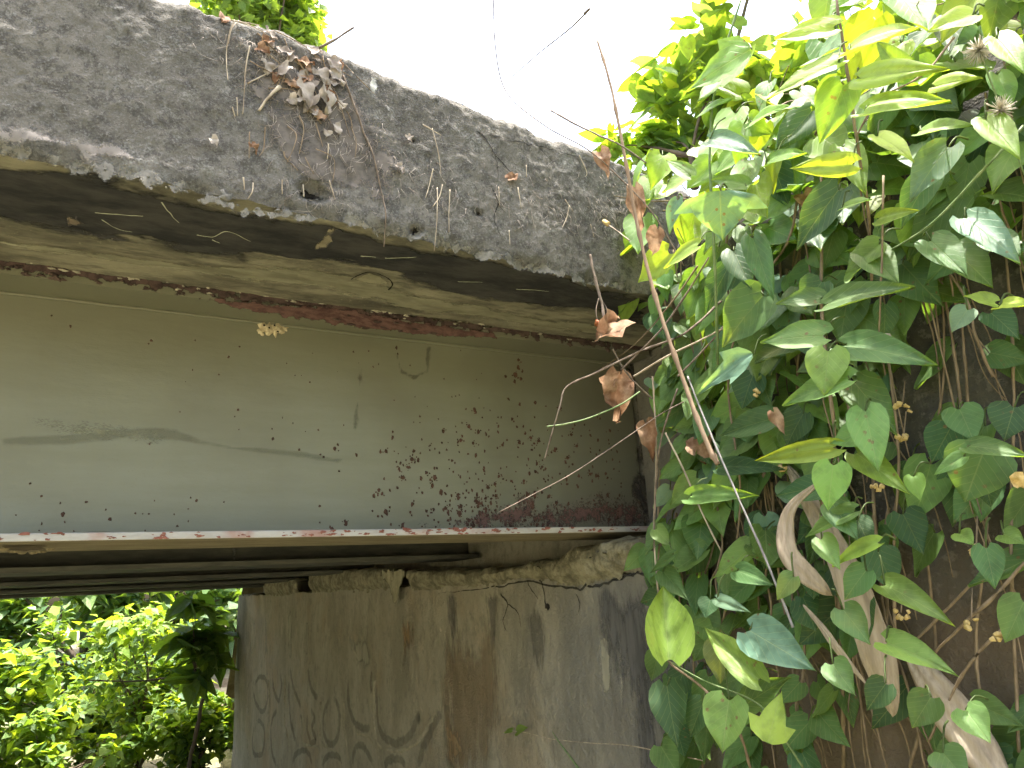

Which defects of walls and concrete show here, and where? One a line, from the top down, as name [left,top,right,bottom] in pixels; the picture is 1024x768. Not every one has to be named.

spalling [0,138,188,193]
damp [0,169,645,345]
corrosion [0,260,648,352]
corrosion [282,398,649,537]
corrosion [18,502,75,541]
crack [443,571,644,630]